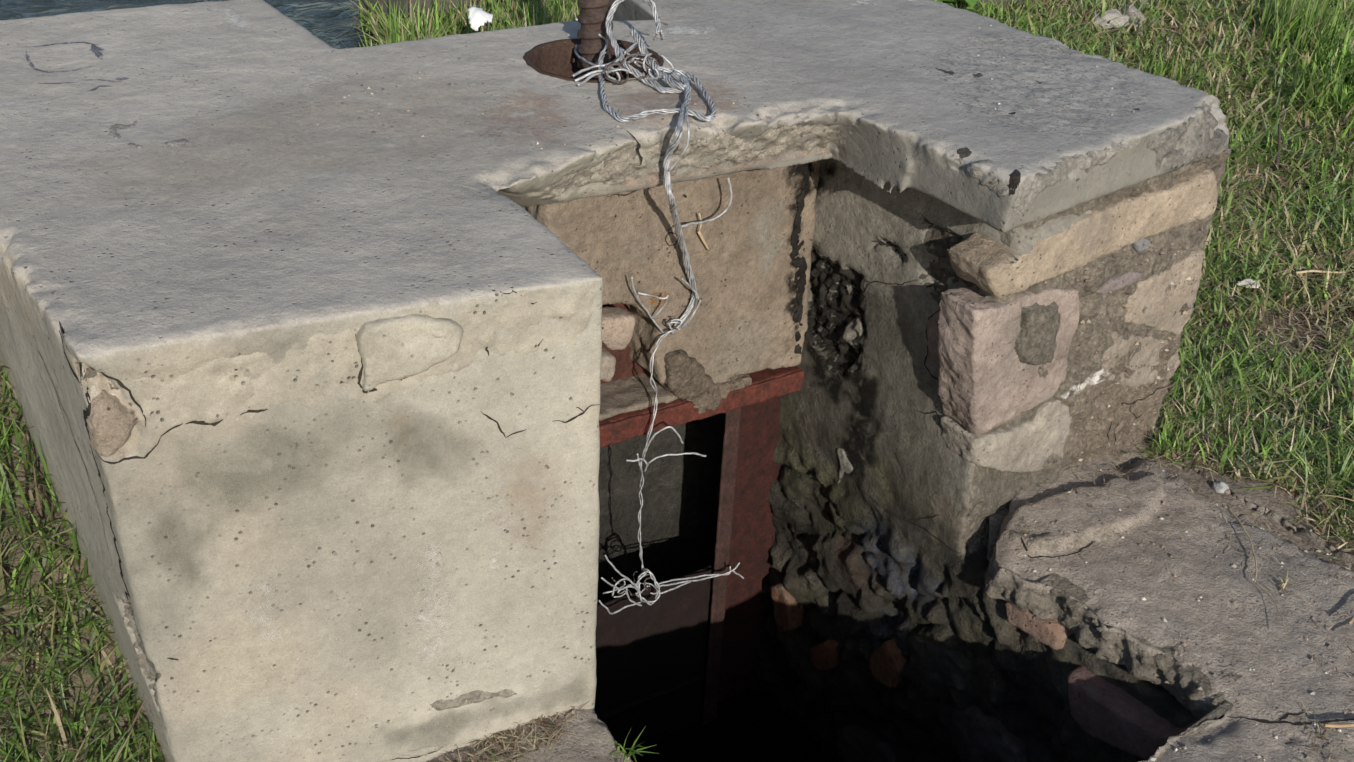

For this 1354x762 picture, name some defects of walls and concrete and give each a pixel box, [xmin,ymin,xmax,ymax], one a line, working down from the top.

spalling [544,116,857,197]
leakage [787,162,835,242]
spalling [59,289,595,464]
leakage [787,247,880,483]
crack [25,313,131,604]
crack [480,404,600,438]
crack [1228,712,1354,726]